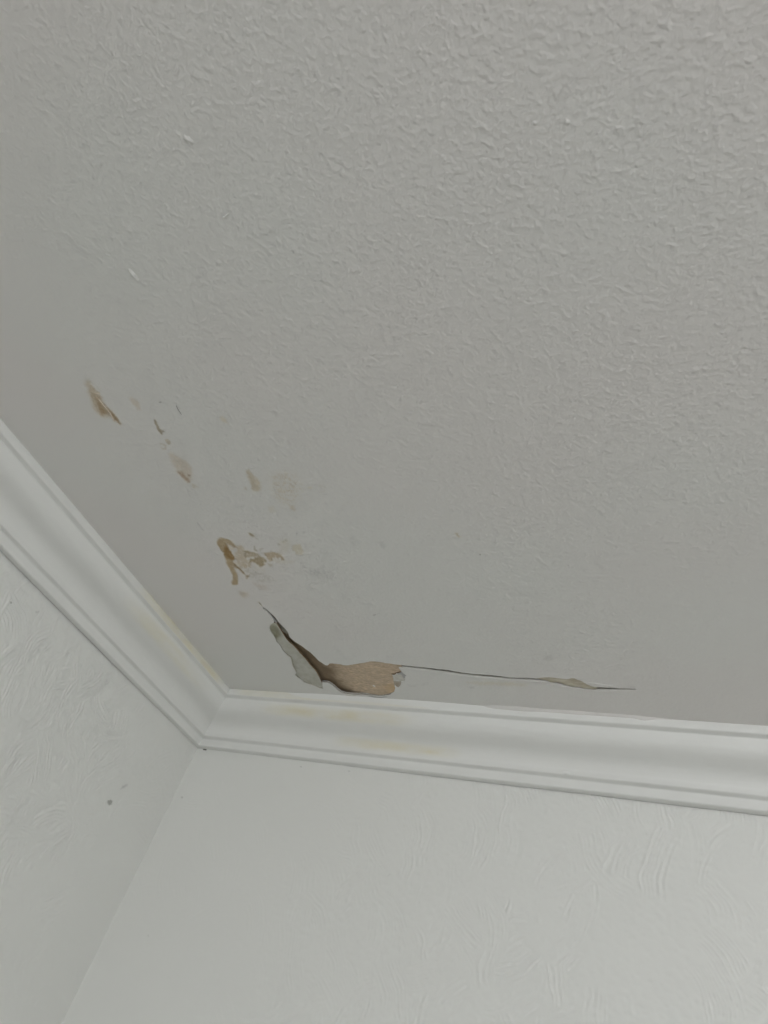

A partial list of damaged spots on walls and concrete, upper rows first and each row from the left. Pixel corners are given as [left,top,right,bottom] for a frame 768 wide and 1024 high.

peeling [270,622,406,696]
crack [400,665,659,693]